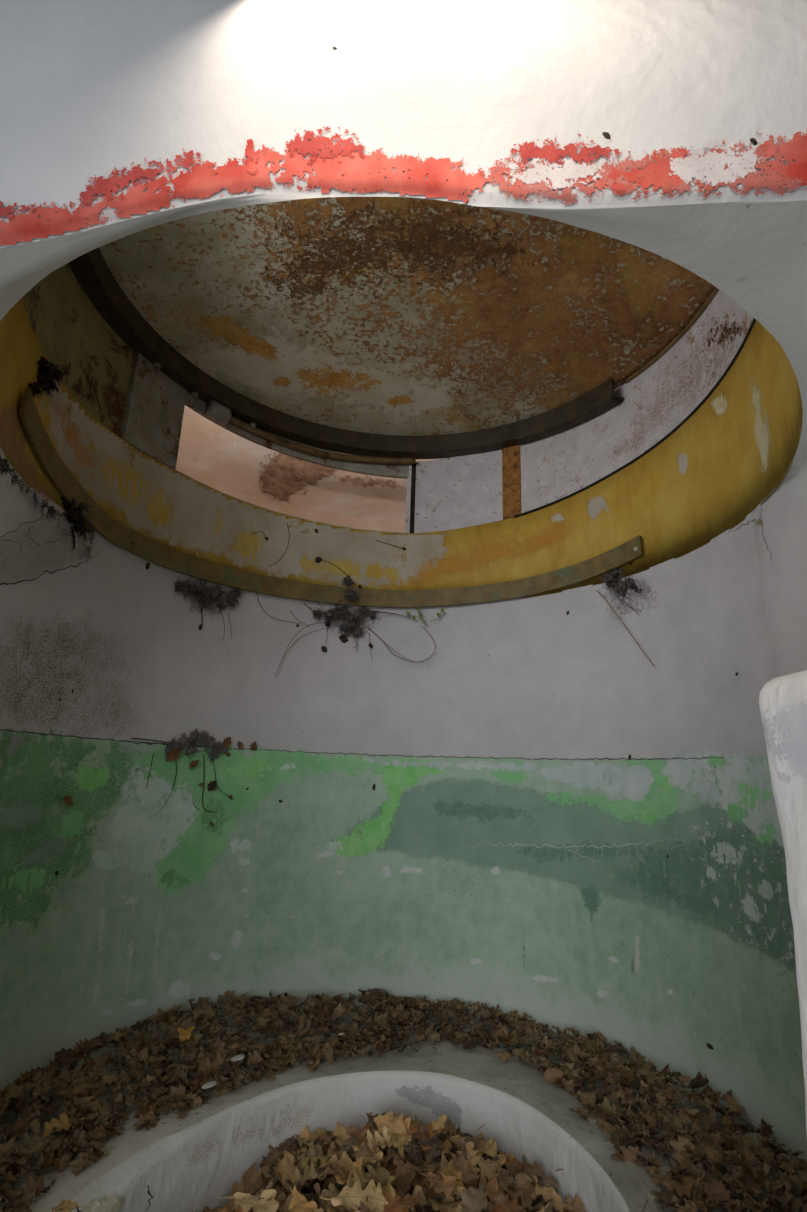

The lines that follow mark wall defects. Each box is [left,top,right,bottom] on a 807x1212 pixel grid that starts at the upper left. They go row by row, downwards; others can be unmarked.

peeling [0,125,807,245]
corrosion [250,197,523,320]
corrosion [197,314,414,408]
corrosion [611,309,749,458]
peeling [711,393,728,416]
water stain [0,599,156,772]
peeling [134,742,796,988]